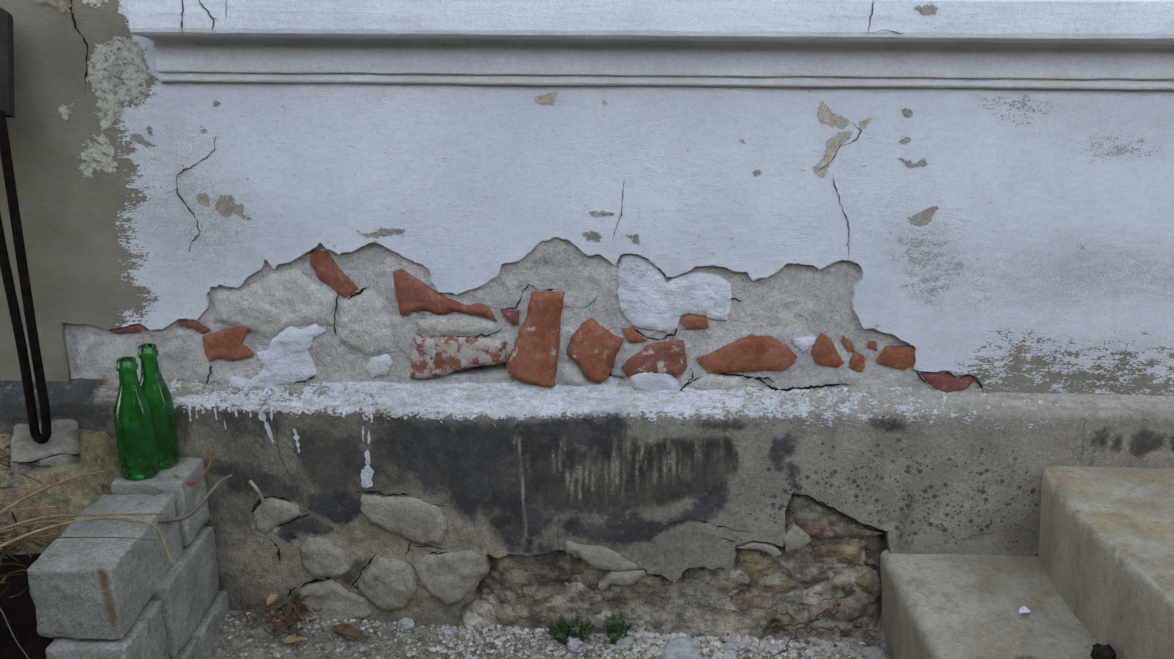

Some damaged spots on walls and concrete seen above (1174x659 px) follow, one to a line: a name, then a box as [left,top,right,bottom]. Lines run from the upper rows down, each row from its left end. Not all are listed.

crack [181,0,227,33]
peeling [76,36,150,178]
crack [166,135,217,251]
crack [817,123,862,260]
peeling [812,101,872,178]
flaking render [64,227,981,393]
leakage [196,406,279,430]
flaking render [251,495,302,543]
leakage [204,414,374,543]
leakage [387,412,746,554]
flaking render [298,493,887,648]
leakage [1092,427,1174,456]